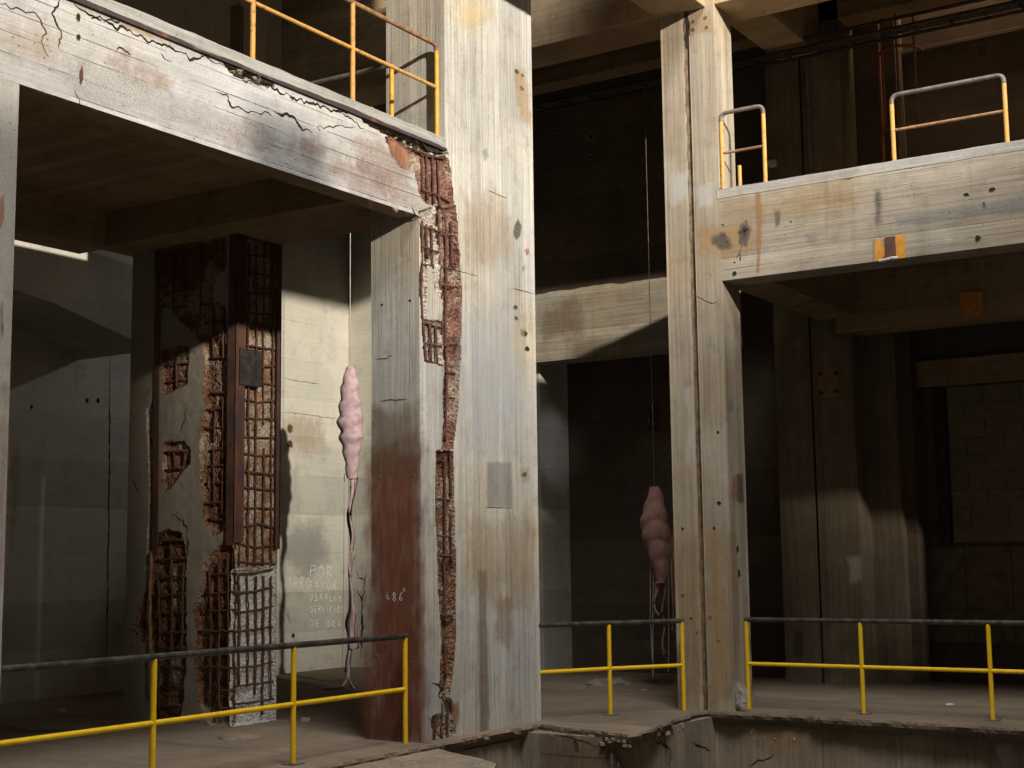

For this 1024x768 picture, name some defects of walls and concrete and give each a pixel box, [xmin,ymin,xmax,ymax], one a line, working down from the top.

crack [3,0,224,66]
crack [218,79,363,133]
rust [389,140,408,167]
spalling [363,121,462,740]
spalling [130,237,293,741]
crack [357,573,367,657]
rust [364,444,427,743]
crack [551,735,600,747]
crack [655,740,708,768]